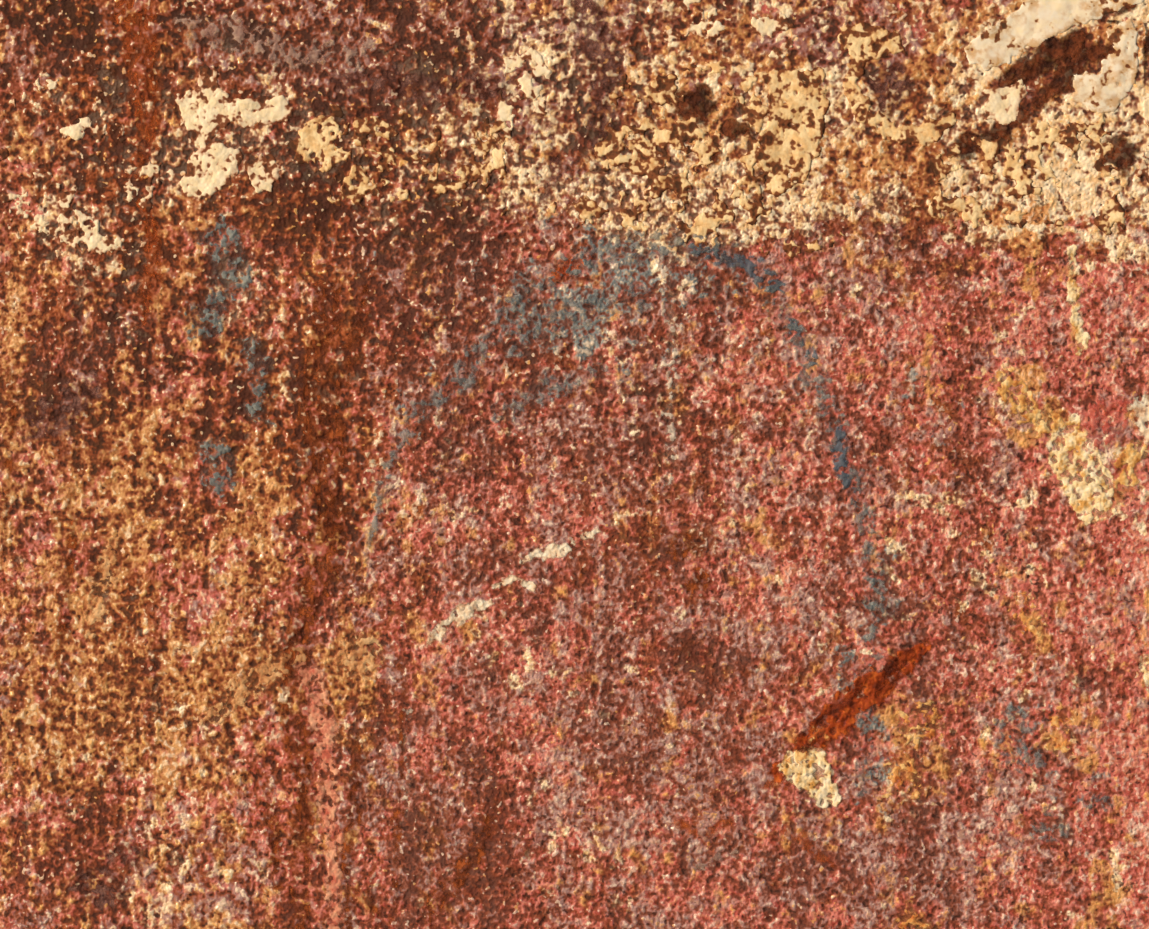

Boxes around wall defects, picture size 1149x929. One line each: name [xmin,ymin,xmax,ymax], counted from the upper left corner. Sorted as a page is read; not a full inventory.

peeling [663,0,726,42]
peeling [175,46,552,209]
peeling [571,11,830,247]
peeling [838,0,1149,235]
peeling [783,230,844,258]
rust [768,638,943,804]
rust [893,906,929,929]